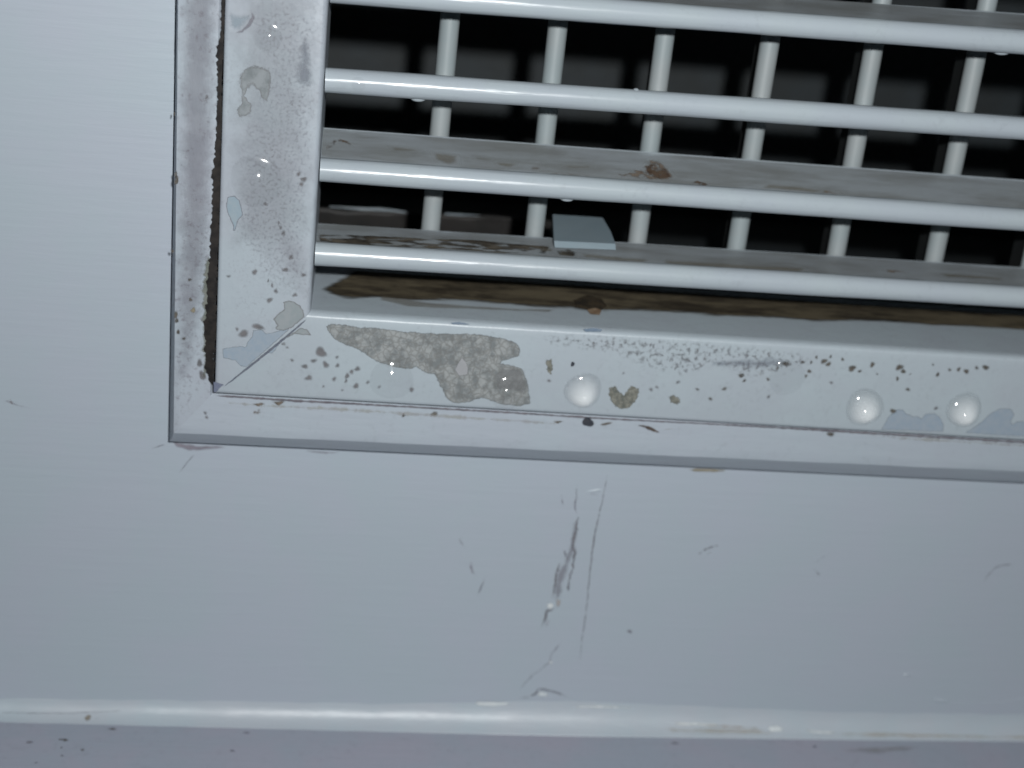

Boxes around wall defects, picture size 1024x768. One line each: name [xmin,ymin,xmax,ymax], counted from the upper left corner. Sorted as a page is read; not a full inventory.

peeling [238,66,271,116]
rust [624,161,671,179]
peeling [223,301,310,367]
peeling [327,322,530,406]
peeling [609,386,639,409]
peeling [882,410,944,432]
crack [542,483,606,637]